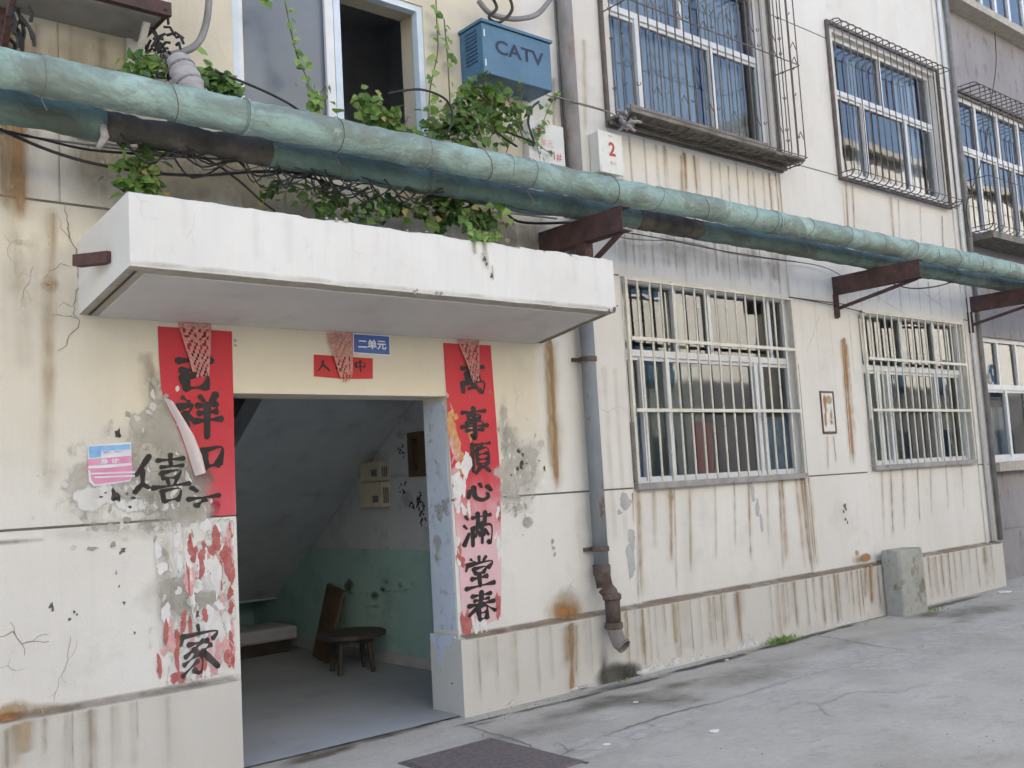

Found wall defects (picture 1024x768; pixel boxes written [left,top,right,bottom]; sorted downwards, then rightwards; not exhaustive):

rust [0,125,25,210]
crack [4,202,83,351]
peeling [67,376,215,555]
peeling [494,406,546,536]
rust [546,340,558,478]
rust [842,338,854,453]
rust [856,551,873,600]
crack [0,622,77,748]
rust [554,597,579,689]